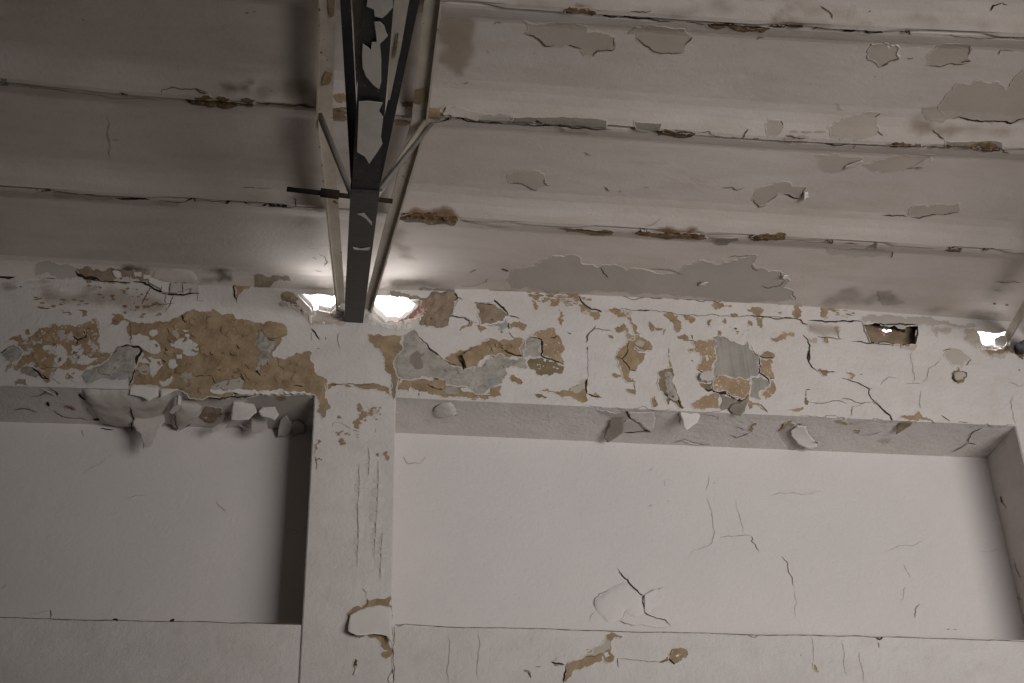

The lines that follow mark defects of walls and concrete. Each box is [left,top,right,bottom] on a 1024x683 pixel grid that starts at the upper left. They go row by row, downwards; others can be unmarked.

spalling [704,22,823,33]
spalling [507,116,608,135]
spalling [634,121,758,139]
peeling [815,69,1024,174]
crack [12,187,296,208]
peeling [1,218,894,450]
peeling [820,307,1024,368]
crack [569,296,1023,452]
peeling [346,596,394,660]
peeling [524,632,623,683]
peeling [660,647,689,665]
crack [388,543,1024,683]